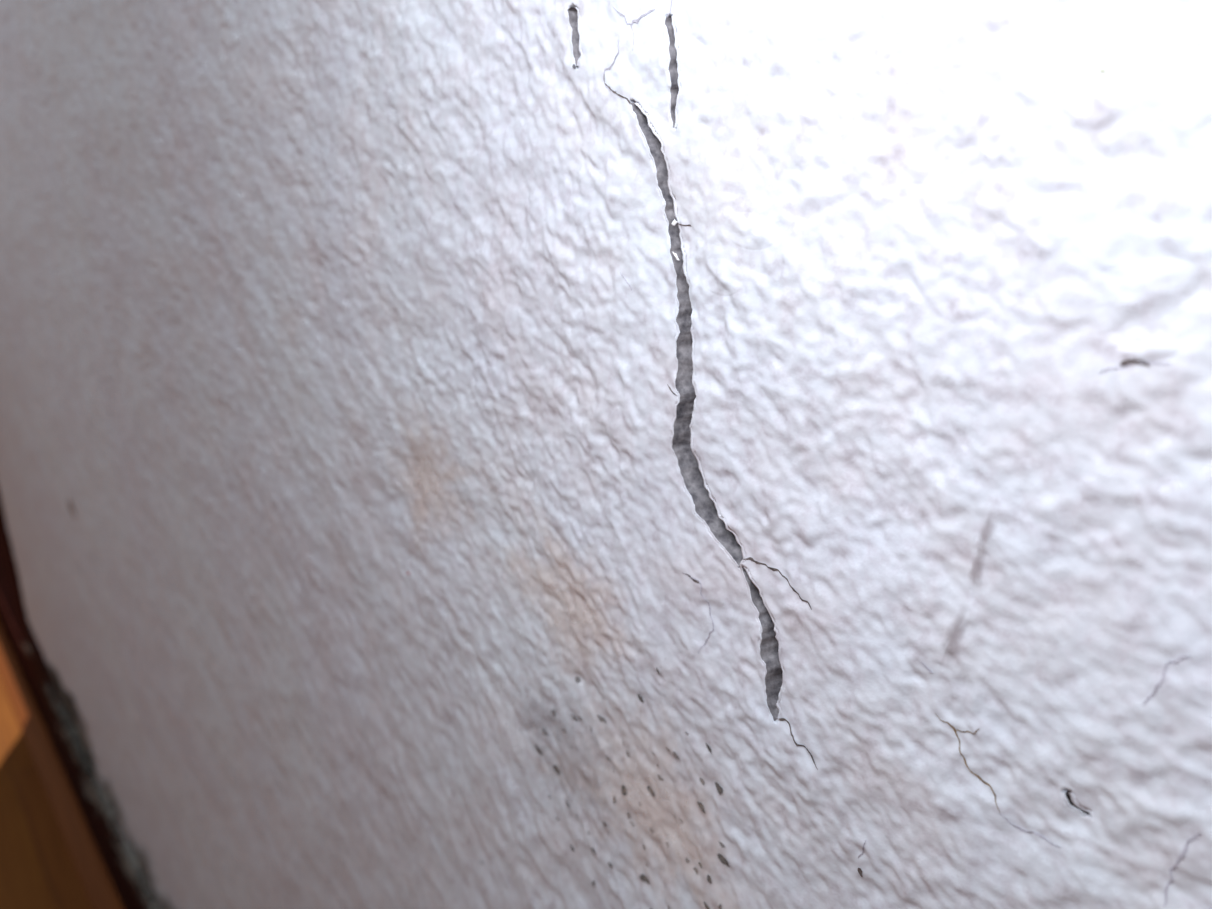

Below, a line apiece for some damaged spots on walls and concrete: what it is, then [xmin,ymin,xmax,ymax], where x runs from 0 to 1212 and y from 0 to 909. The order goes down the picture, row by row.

crack [566,0,818,770]
crack [935,713,1061,848]